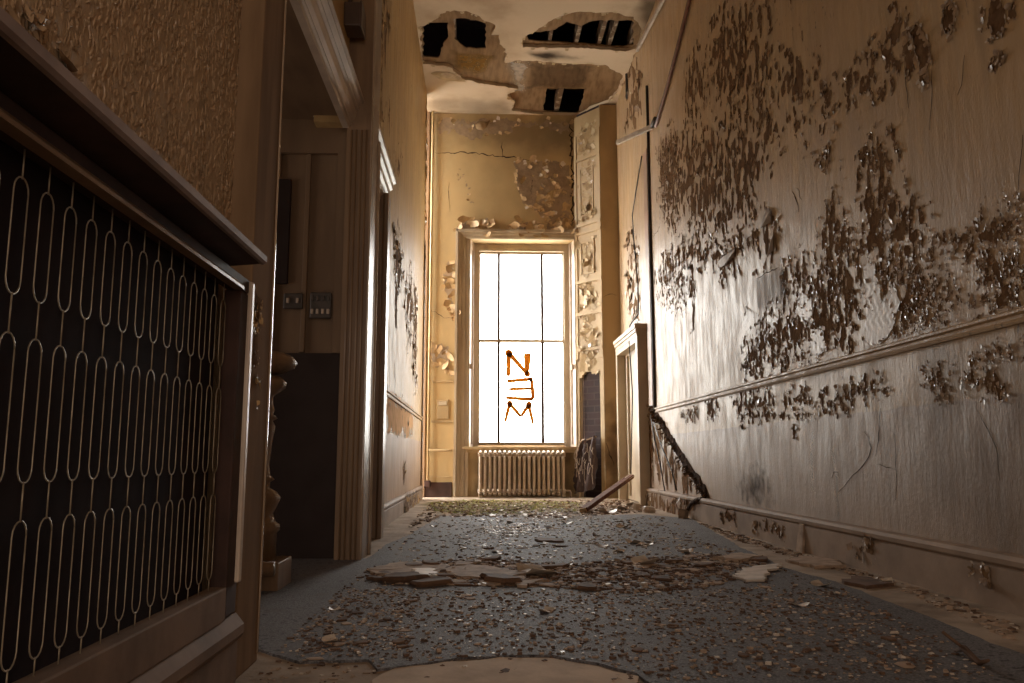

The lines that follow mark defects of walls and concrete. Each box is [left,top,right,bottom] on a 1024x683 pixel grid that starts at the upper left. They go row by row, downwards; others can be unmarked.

peeling [611,51,642,135]
crack [445,145,533,194]
peeling [386,224,454,440]
peeling [441,260,461,321]
peeling [453,119,601,375]
peeling [623,228,640,323]
peeling [653,0,1024,439]
crack [832,415,897,485]